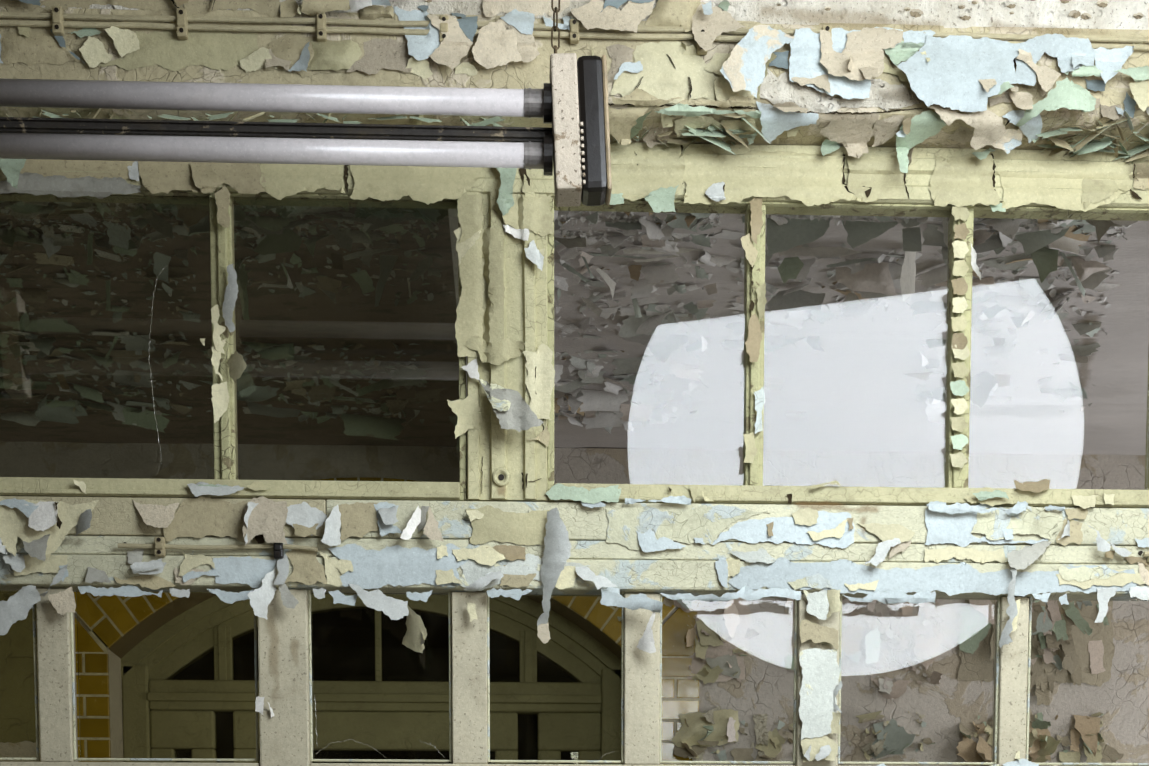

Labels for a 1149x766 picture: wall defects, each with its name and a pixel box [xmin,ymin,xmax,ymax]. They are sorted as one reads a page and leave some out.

crack [342,165,350,192]
crack [841,154,854,194]
crack [989,153,997,191]
peeling [0,0,1149,468]